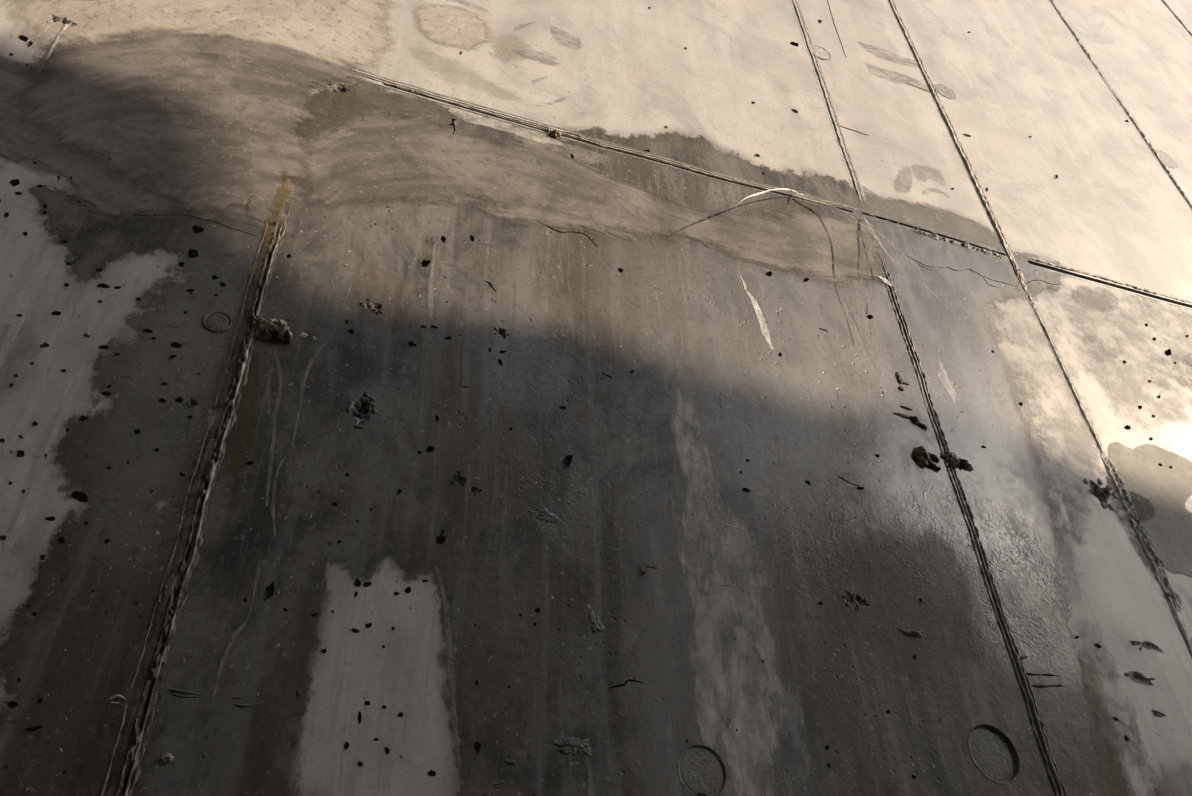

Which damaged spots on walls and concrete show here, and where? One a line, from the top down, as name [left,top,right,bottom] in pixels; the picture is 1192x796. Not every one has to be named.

crack [905,255,1058,287]